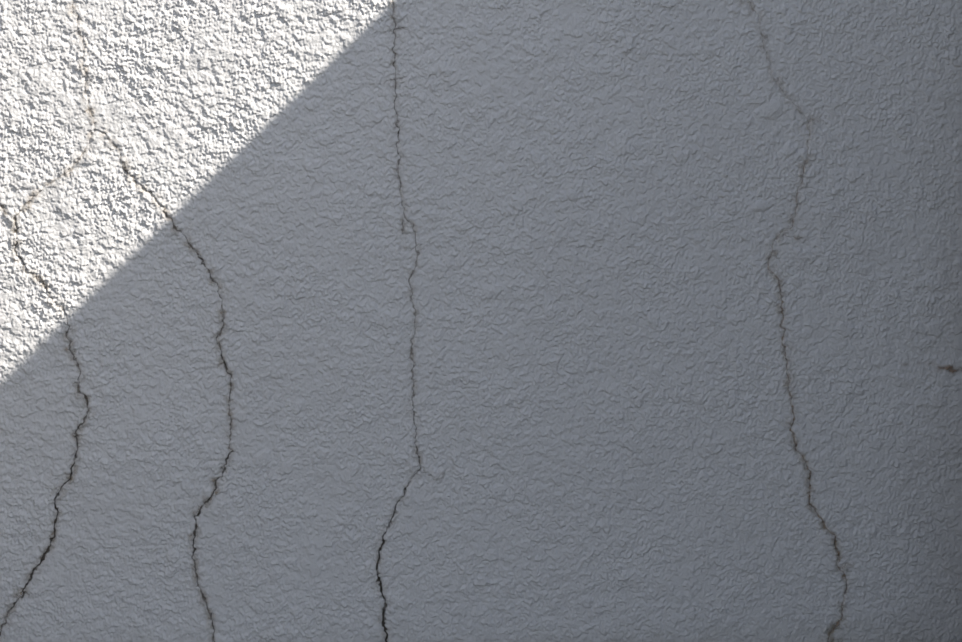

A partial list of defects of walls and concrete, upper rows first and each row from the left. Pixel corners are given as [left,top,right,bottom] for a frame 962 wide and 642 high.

crack [0,194,89,635]
crack [113,144,232,639]
crack [376,313,421,642]
crack [790,406,847,590]